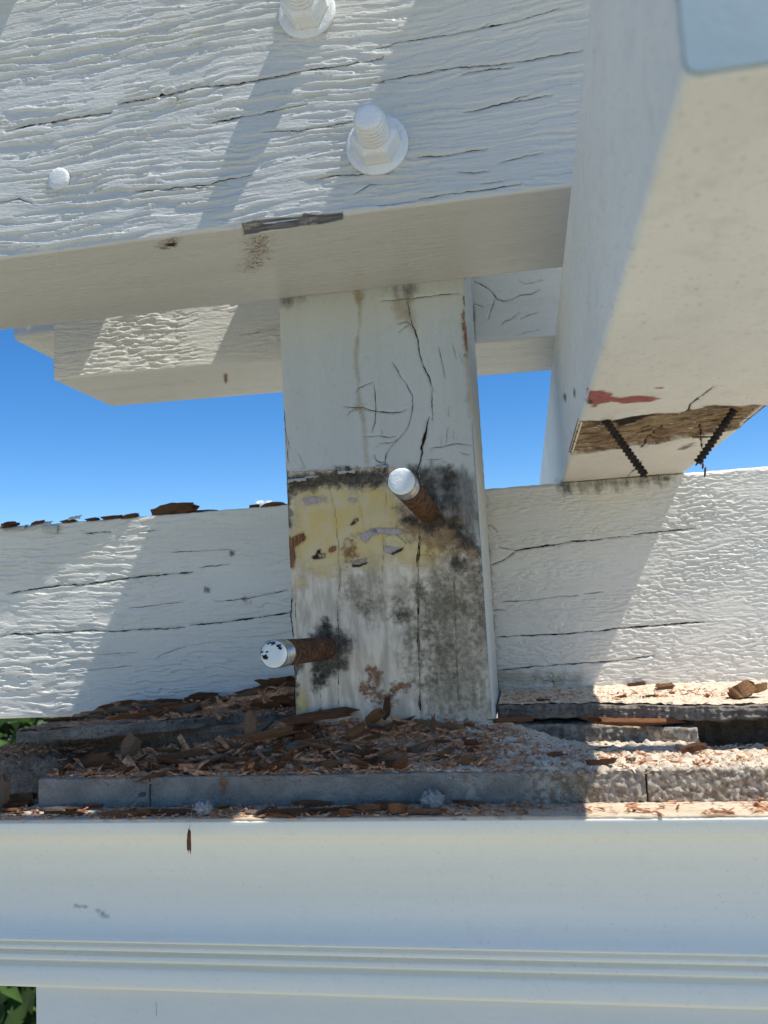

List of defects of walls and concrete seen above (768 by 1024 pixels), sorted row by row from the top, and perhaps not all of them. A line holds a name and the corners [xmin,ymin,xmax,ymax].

crack [8,9,579,132]
crack [316,148,540,206]
crack [345,299,470,473]
spalling [568,387,765,453]
crack [13,549,229,593]
water stain [286,466,483,714]
peeling [286,424,495,723]
crack [491,528,693,565]
crack [3,590,296,672]
crack [502,622,699,637]
corrosion [359,667,411,707]
crack [497,656,649,683]